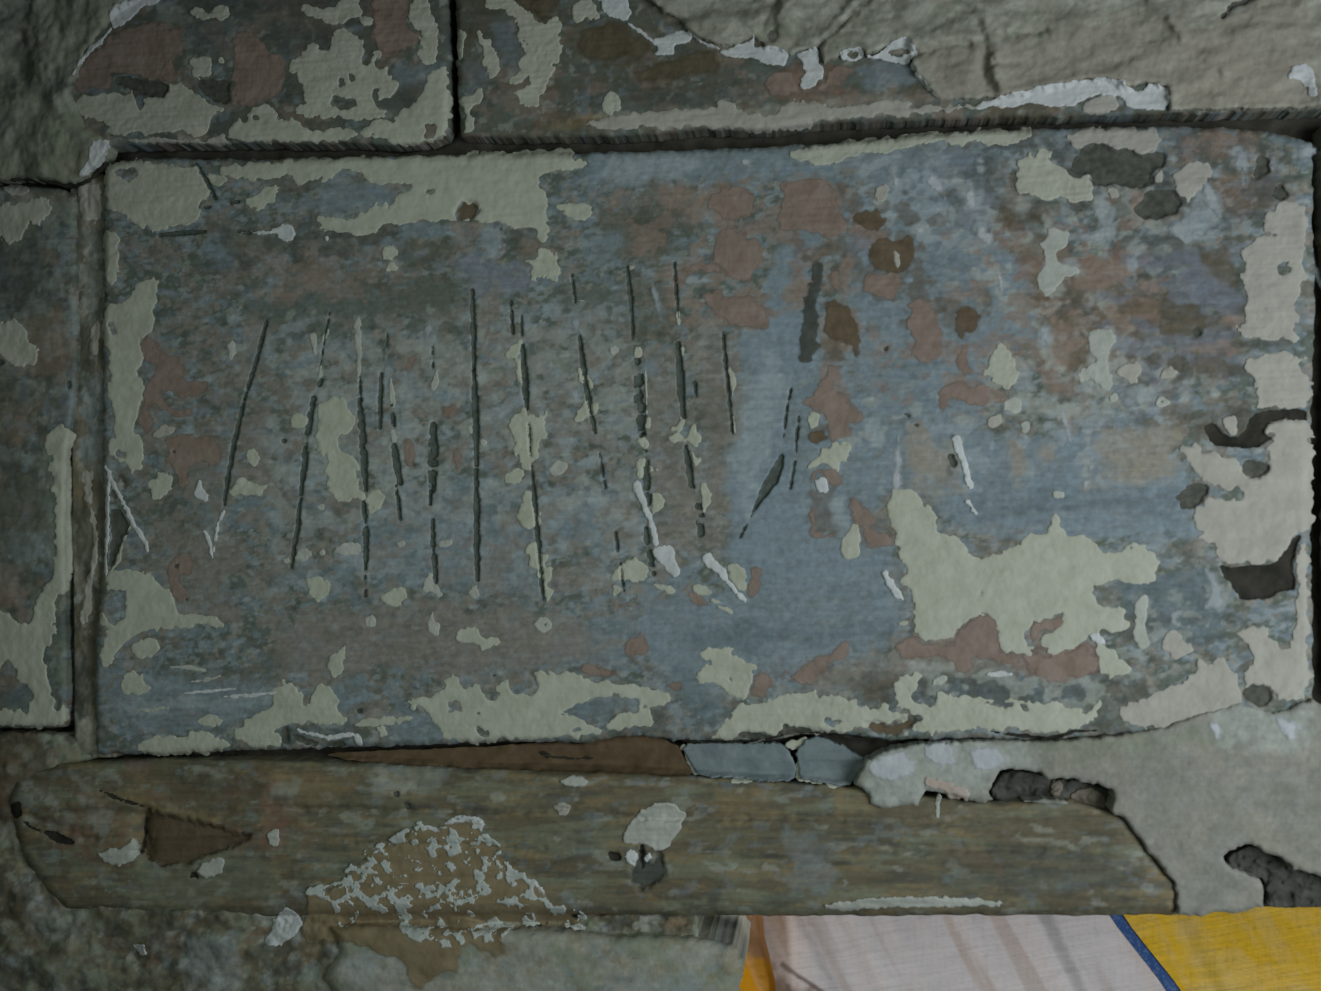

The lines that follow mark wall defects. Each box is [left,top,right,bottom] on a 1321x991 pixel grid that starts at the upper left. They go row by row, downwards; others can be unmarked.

peeling [0,185,52,245]
peeling [76,0,600,285]
peeling [586,91,1222,244]
peeling [0,277,224,730]
peeling [282,396,385,514]
peeling [504,407,568,633]
peeling [610,346,658,492]
peeling [807,441,851,493]
peeling [886,156,1321,731]
peeling [137,646,1102,789]
spalling [991,770,1110,811]
spalling [1227,845,1321,908]